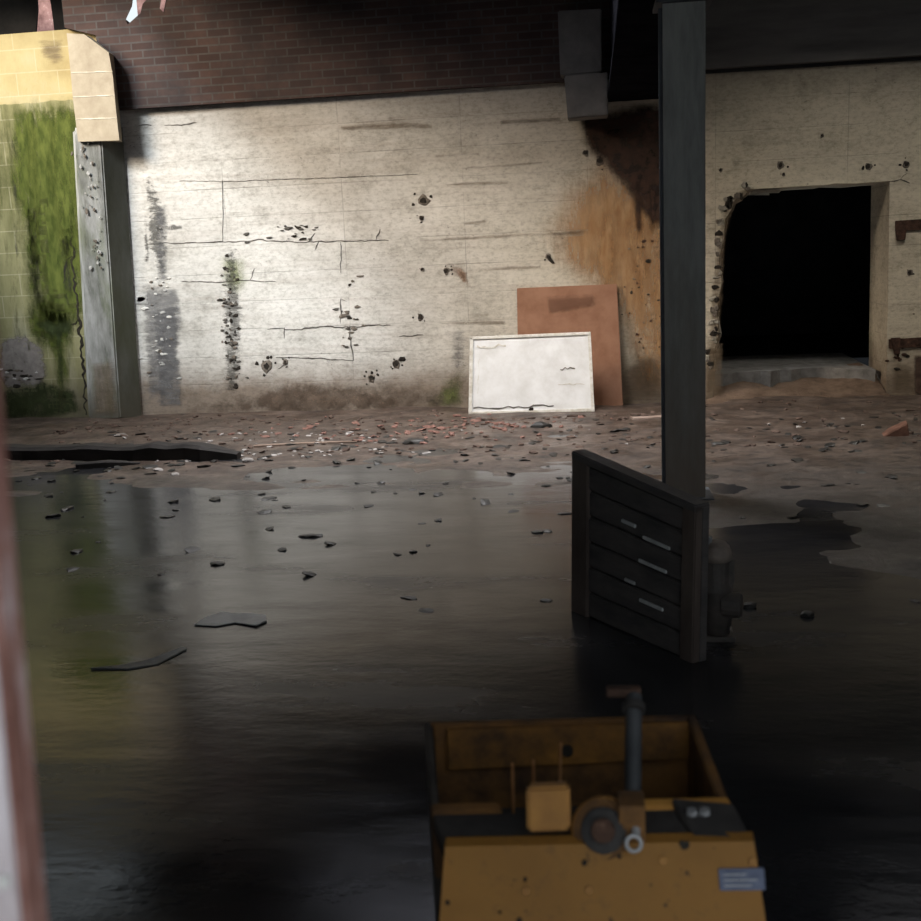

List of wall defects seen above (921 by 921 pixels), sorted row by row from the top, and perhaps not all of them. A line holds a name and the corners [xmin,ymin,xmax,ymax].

water stain [51,110,76,292]
water stain [145,182,182,279]
water stain [147,290,180,405]
rust [566,174,661,382]
spalling [706,181,751,398]